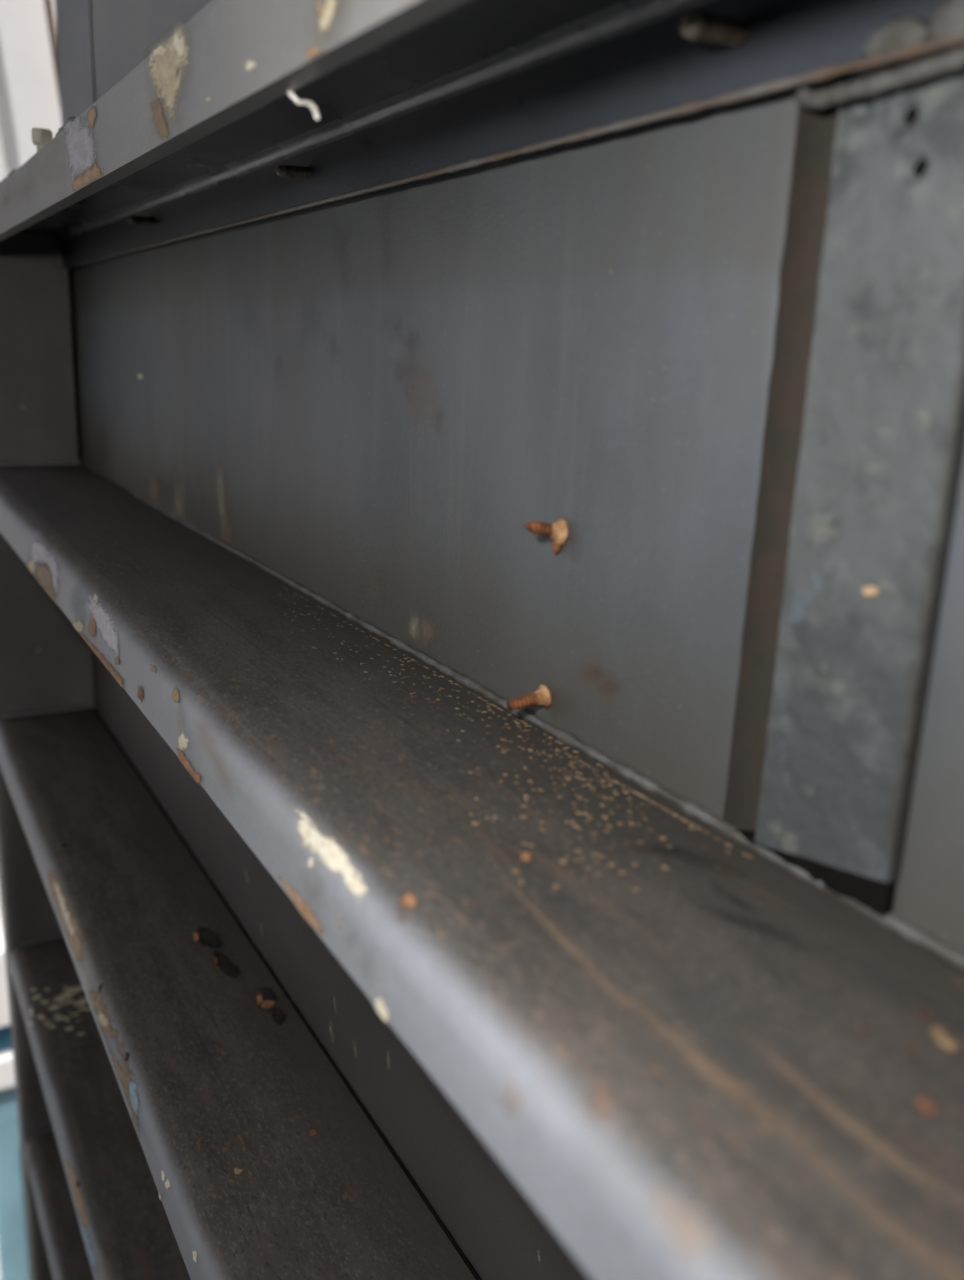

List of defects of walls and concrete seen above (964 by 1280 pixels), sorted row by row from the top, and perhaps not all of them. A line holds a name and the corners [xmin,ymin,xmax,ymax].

peeling [317,0,336,31]
peeling [149,25,189,138]
peeling [63,105,103,192]
peeling [27,538,60,605]
peeling [72,592,144,703]
corrosion [280,586,752,884]
peeling [295,810,368,902]
peeling [279,877,324,935]
peeling [29,984,140,1132]